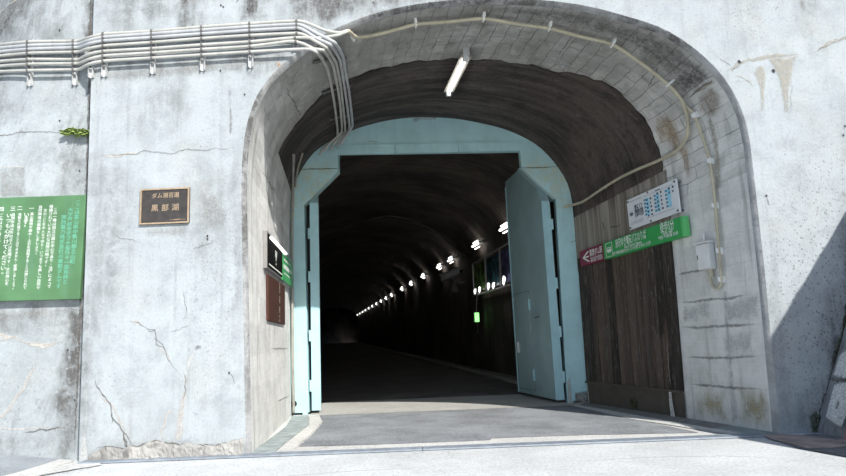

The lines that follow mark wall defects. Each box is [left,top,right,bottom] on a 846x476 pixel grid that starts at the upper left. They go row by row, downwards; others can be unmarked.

crack [85,0,223,195]
crack [0,333,53,348]
crack [29,292,225,449]
spalling [88,438,247,461]